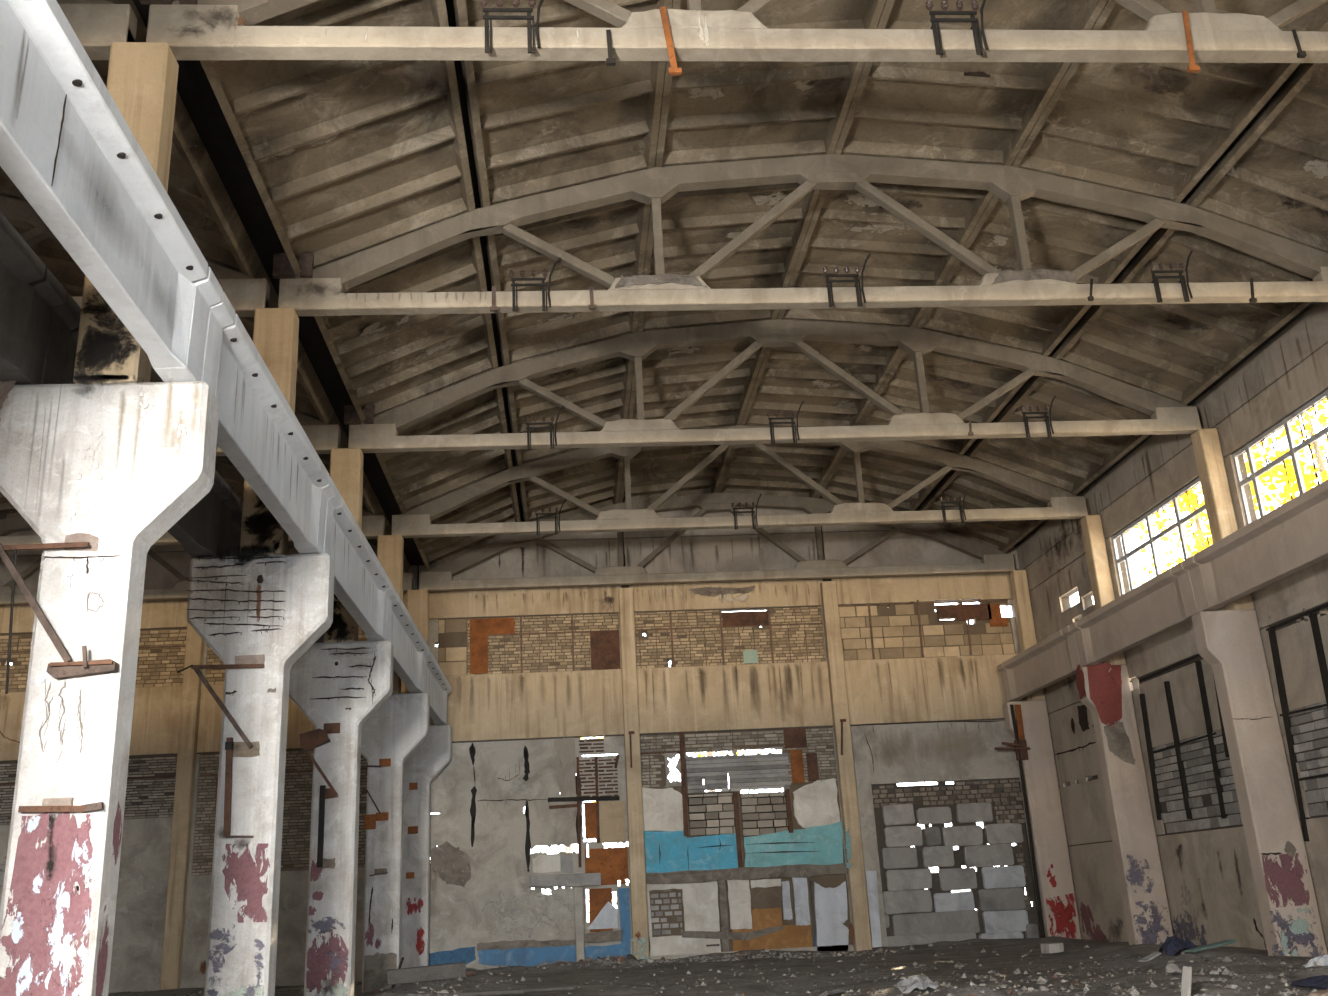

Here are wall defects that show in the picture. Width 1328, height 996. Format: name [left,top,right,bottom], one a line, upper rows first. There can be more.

crack [43,555,121,615]
crack [185,556,286,637]
crack [0,679,85,762]
crack [312,647,376,710]
peeling [1071,662,1136,765]
peeling [0,801,122,996]
peeling [200,843,270,996]
peeling [306,860,349,996]
peeling [406,898,425,955]
peeling [1046,864,1104,942]
peeling [1126,855,1207,945]
peeling [1262,841,1323,957]